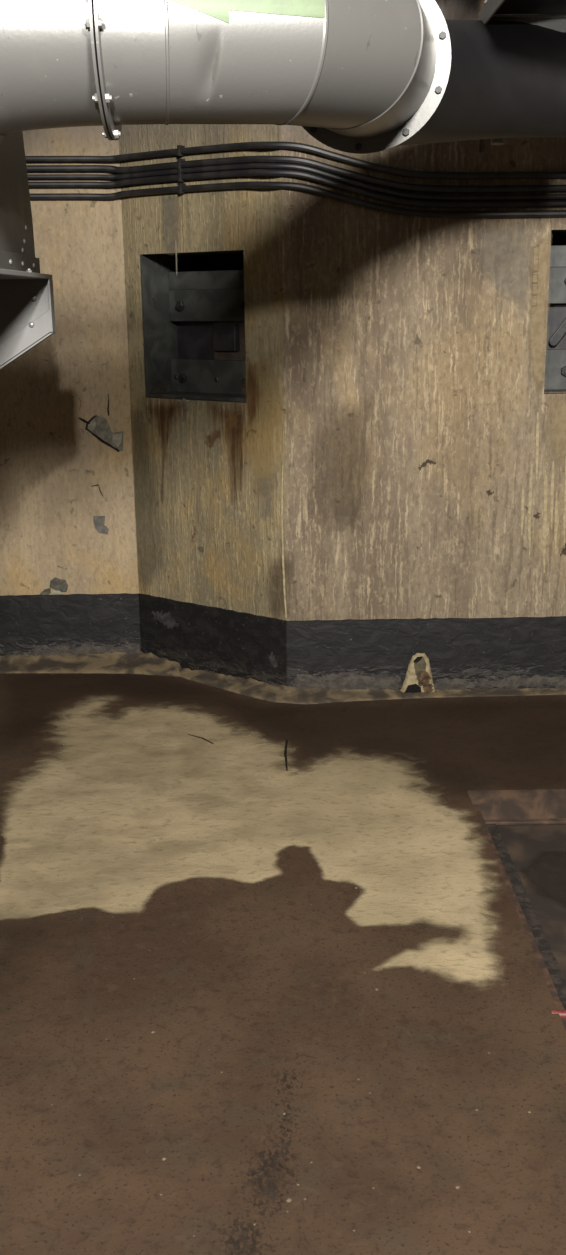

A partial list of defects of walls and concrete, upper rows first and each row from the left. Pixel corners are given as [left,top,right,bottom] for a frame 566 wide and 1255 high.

peeling [93,516,109,534]